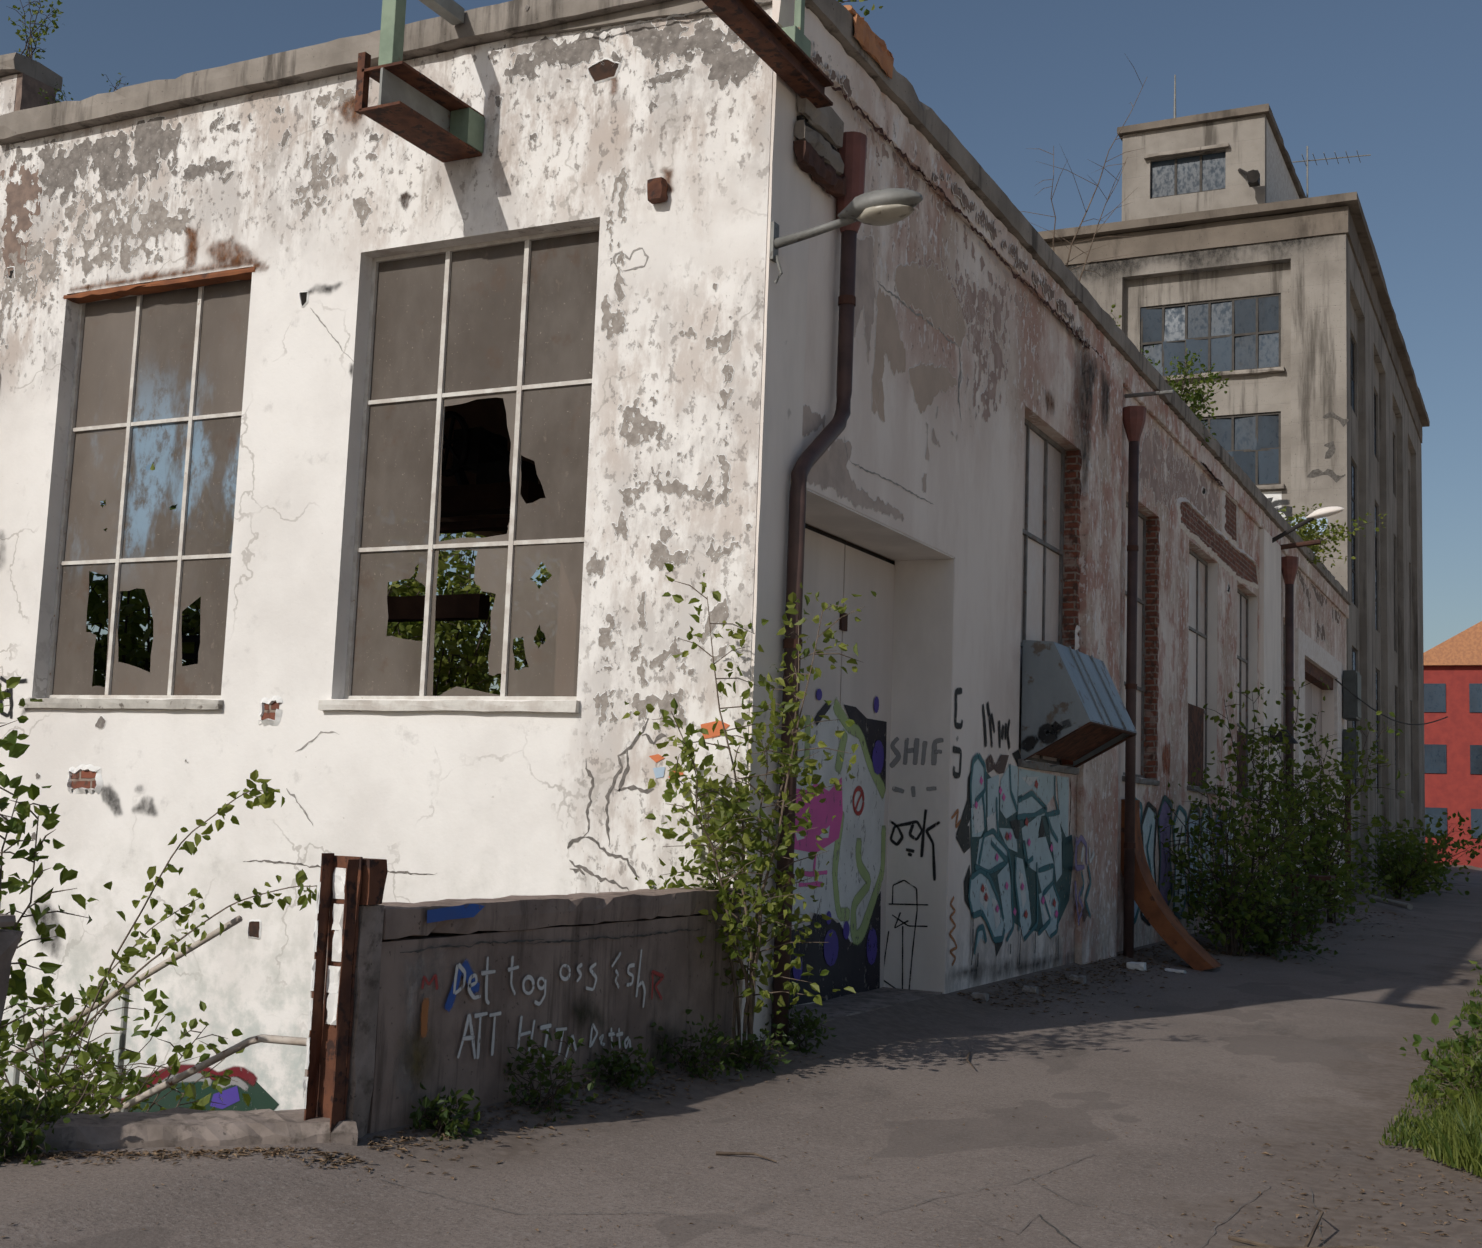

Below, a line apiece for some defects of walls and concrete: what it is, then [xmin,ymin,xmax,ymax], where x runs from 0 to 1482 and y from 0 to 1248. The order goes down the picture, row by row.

corrosion [339,98,360,122]
peeling [487,14,762,113]
peeling [0,116,234,349]
peeling [600,166,629,341]
spalling [793,41,1090,493]
peeling [611,316,753,571]
peeling [593,591,730,733]
crack [243,860,320,868]
crack [286,788,313,825]
crack [295,731,337,752]
crack [388,869,437,877]
crack [567,718,666,890]